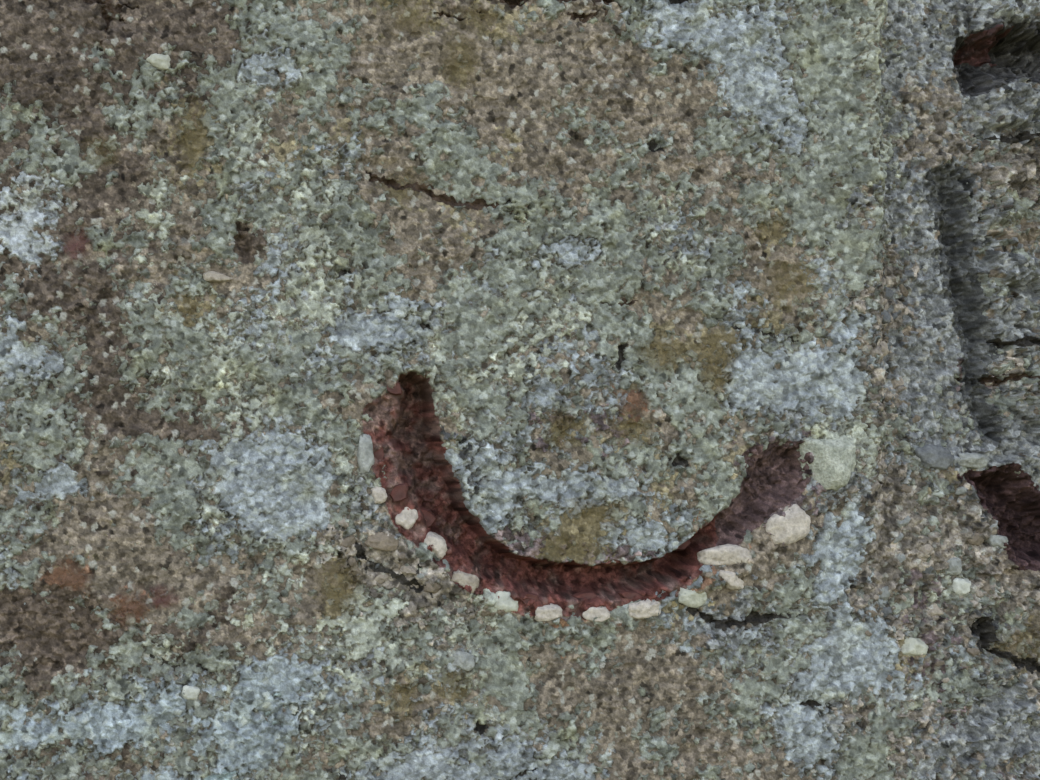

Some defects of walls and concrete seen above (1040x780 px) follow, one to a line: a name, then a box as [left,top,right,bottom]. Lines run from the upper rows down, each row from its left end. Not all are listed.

spalling [668,453,689,467]
spalling [957,462,1040,571]